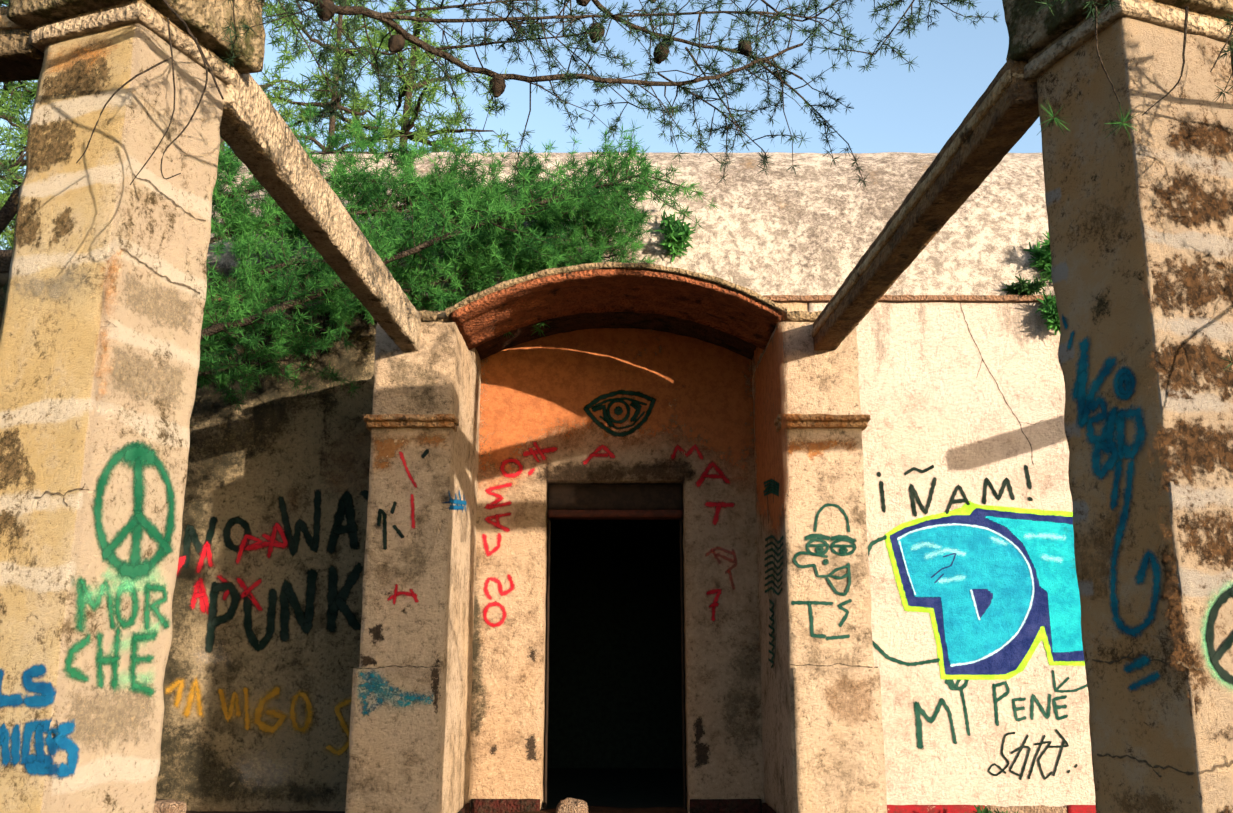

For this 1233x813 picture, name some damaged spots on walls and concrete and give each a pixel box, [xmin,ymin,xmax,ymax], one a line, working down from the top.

crack [957,293,1043,465]
leakage [156,254,374,806]
crack [1097,754,1233,777]